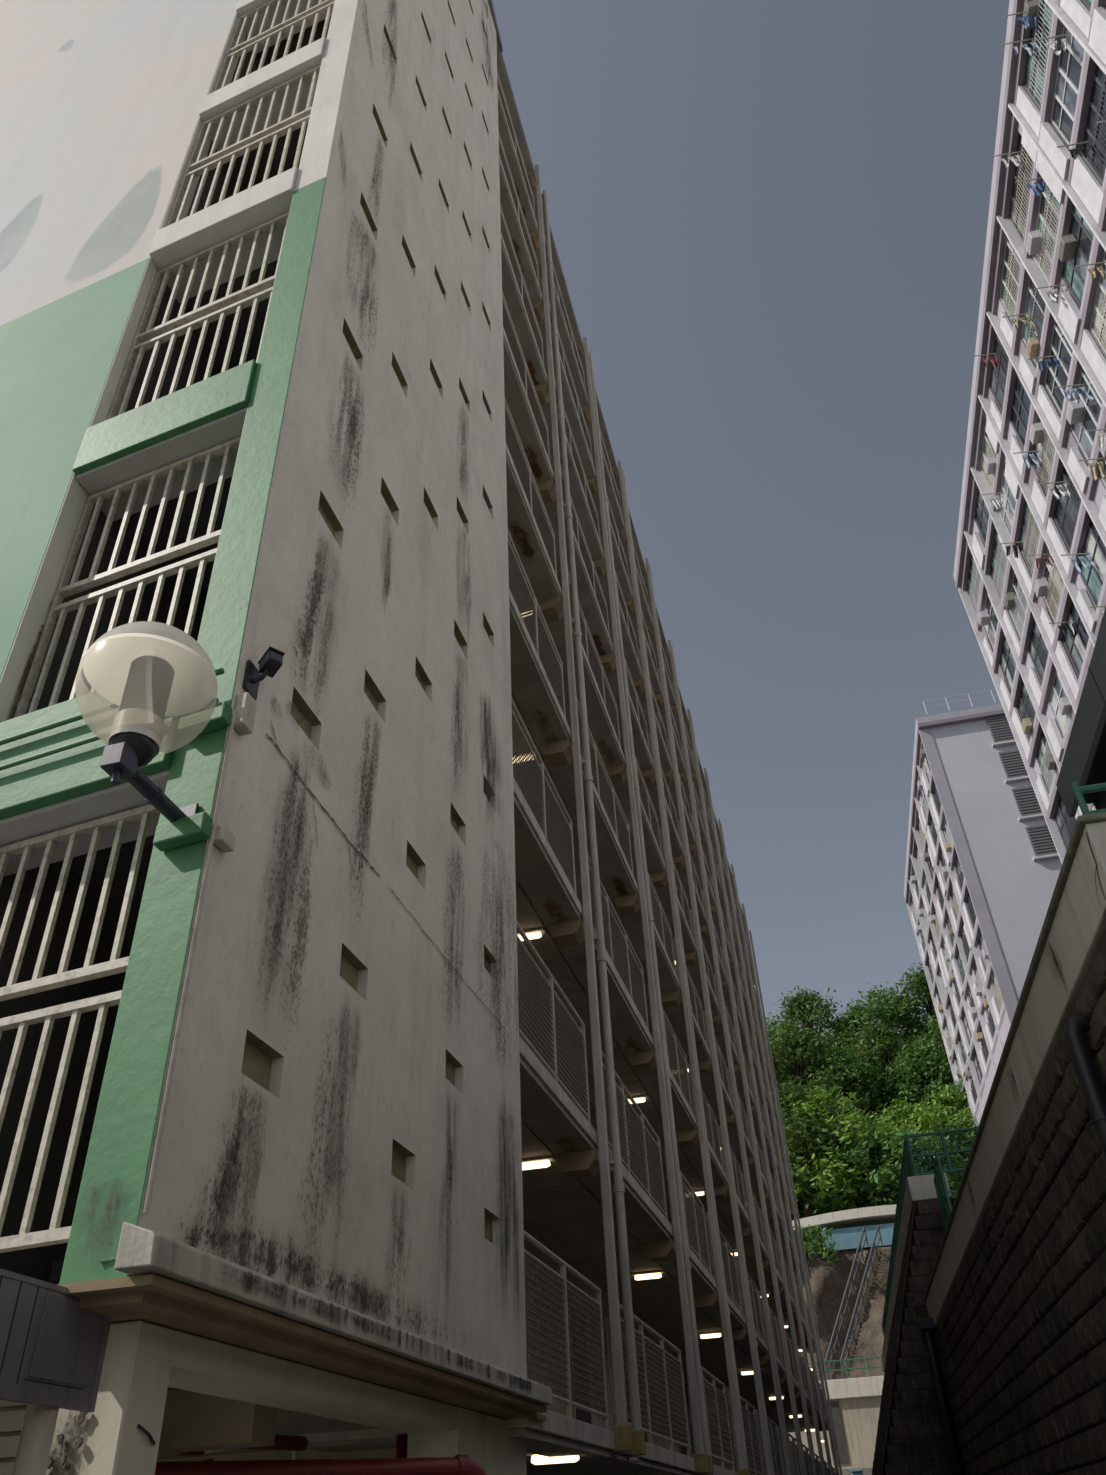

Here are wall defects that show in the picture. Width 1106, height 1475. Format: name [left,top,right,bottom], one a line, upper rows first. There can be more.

damp [338,368,359,481]
damp [265,755,307,969]
damp [225,1097,531,1391]